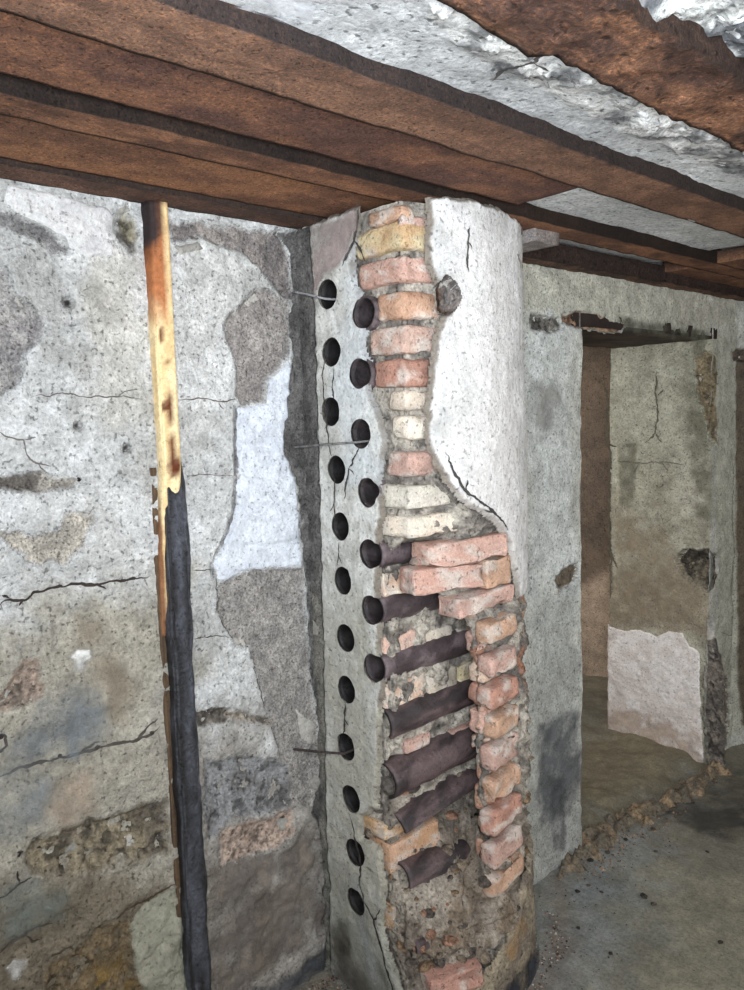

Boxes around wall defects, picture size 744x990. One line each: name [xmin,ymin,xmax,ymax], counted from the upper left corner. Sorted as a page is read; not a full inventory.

spalling [433,274,462,315]
crack [445,452,508,530]
spalling [674,548,720,592]
crack [0,577,148,610]
crack [0,719,158,777]